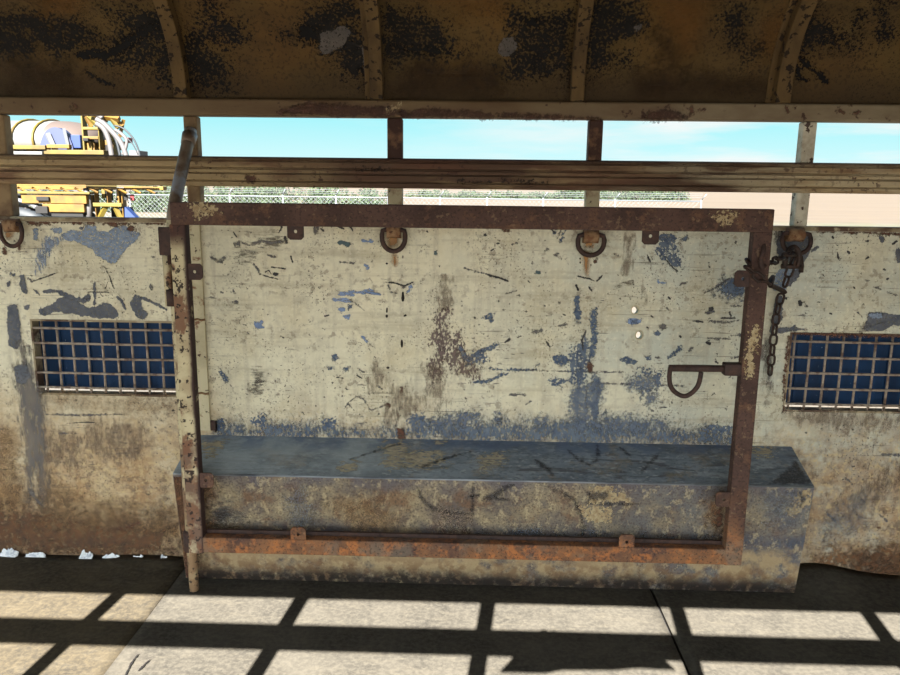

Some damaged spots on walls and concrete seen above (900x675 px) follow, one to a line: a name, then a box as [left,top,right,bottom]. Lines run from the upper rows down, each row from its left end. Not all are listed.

water stain [795,56,829,85]
rust [276,101,601,121]
rust [643,109,688,123]
peeling [50,225,141,264]
peeling [6,272,167,349]
peeling [558,275,603,327]
peeling [626,315,667,336]
spalling [458,335,693,396]
water stain [12,339,51,505]